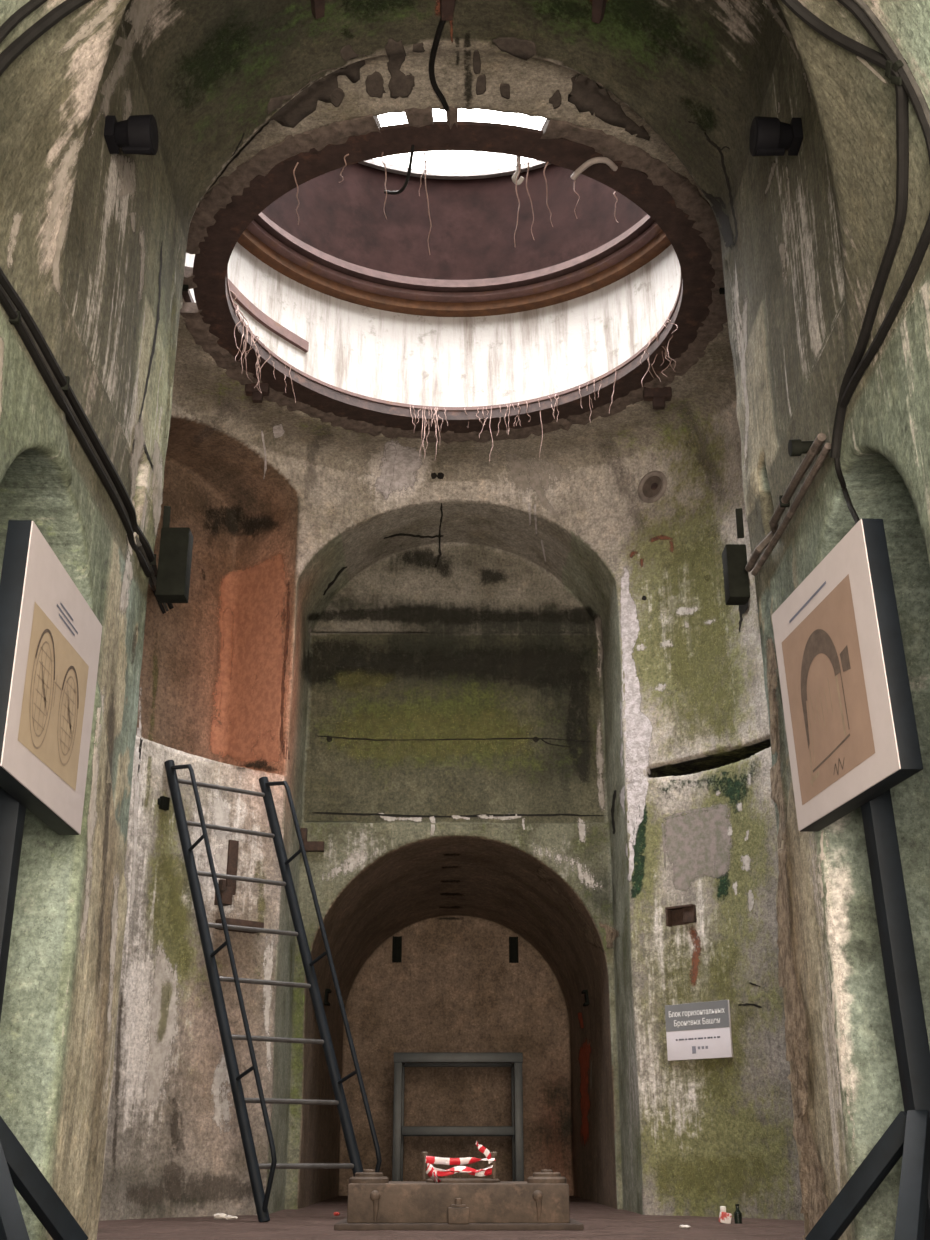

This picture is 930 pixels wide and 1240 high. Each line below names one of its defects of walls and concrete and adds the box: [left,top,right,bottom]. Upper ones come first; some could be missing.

peeling [492,37,537,61]
peeling [473,50,510,99]
peeling [549,74,650,141]
crack [384,503,443,566]
crack [323,566,347,595]
leakage [402,549,450,576]
leakage [480,569,506,584]
leakage [302,606,605,809]
leakage [620,568,652,881]
leakage [322,850,376,879]
leakage [544,849,602,888]
corrosion [686,923,701,986]